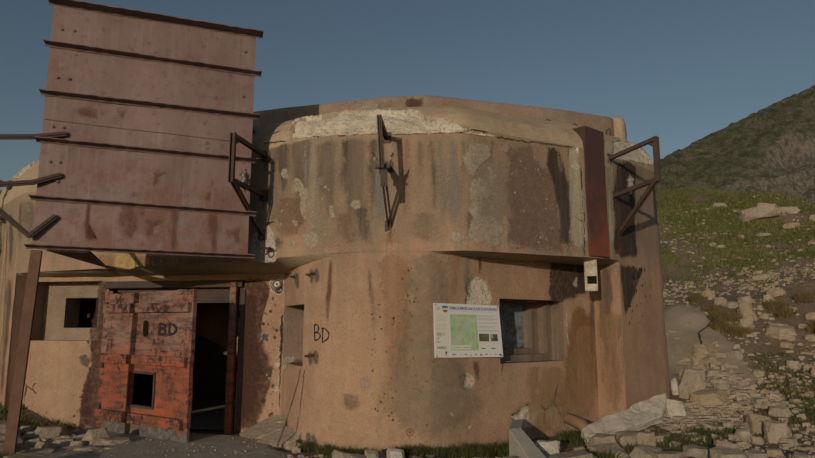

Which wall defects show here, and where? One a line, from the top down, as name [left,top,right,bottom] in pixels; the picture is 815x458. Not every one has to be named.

water stain [251,145,316,263]
water stain [364,140,386,217]
spalling [281,101,510,249]
water stain [237,278,277,429]
spalling [466,274,492,305]
water stain [528,147,651,430]